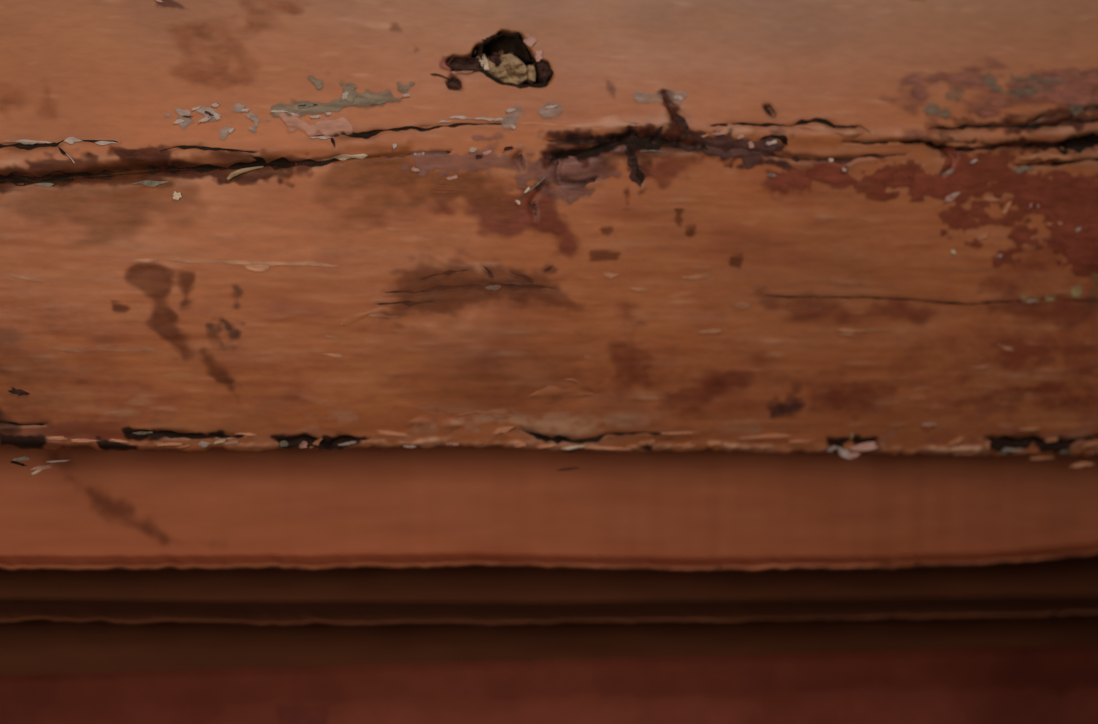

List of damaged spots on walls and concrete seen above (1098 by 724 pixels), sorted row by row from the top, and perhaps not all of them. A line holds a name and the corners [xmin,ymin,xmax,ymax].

spalling [431,71,473,89]
peeling [166,103,234,140]
peeling [234,82,414,136]
crack [0,116,503,192]
crack [517,89,1098,216]
peeling [828,146,1098,297]
damp [127,264,193,350]
peeling [0,427,257,475]
peeling [271,434,364,449]
peeling [514,432,722,452]
peeling [827,432,878,460]
peeling [948,427,1098,468]